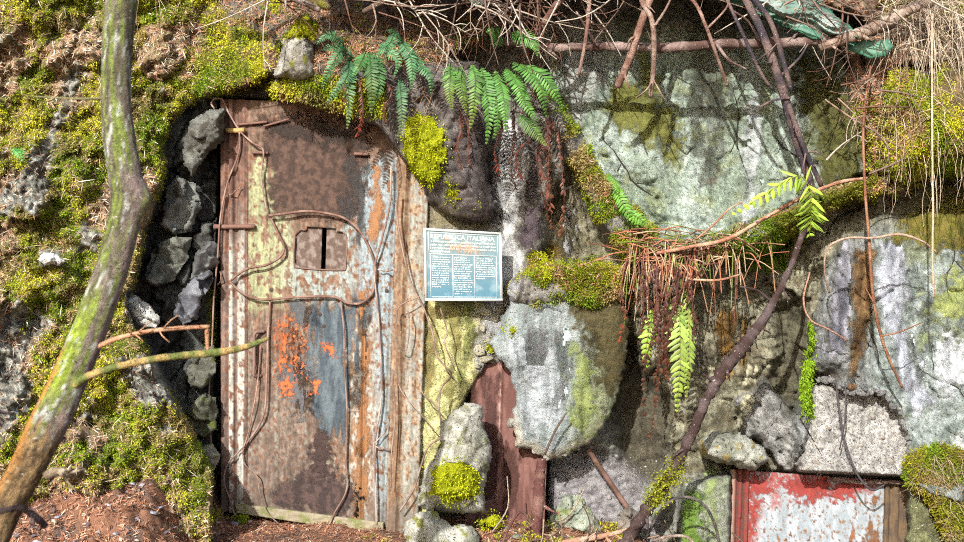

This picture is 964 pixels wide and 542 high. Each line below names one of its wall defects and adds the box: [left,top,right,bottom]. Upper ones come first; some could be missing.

rust [255,111,385,245]
rust [358,288,373,319]
rust [269,334,373,519]
rust [849,495,880,542]